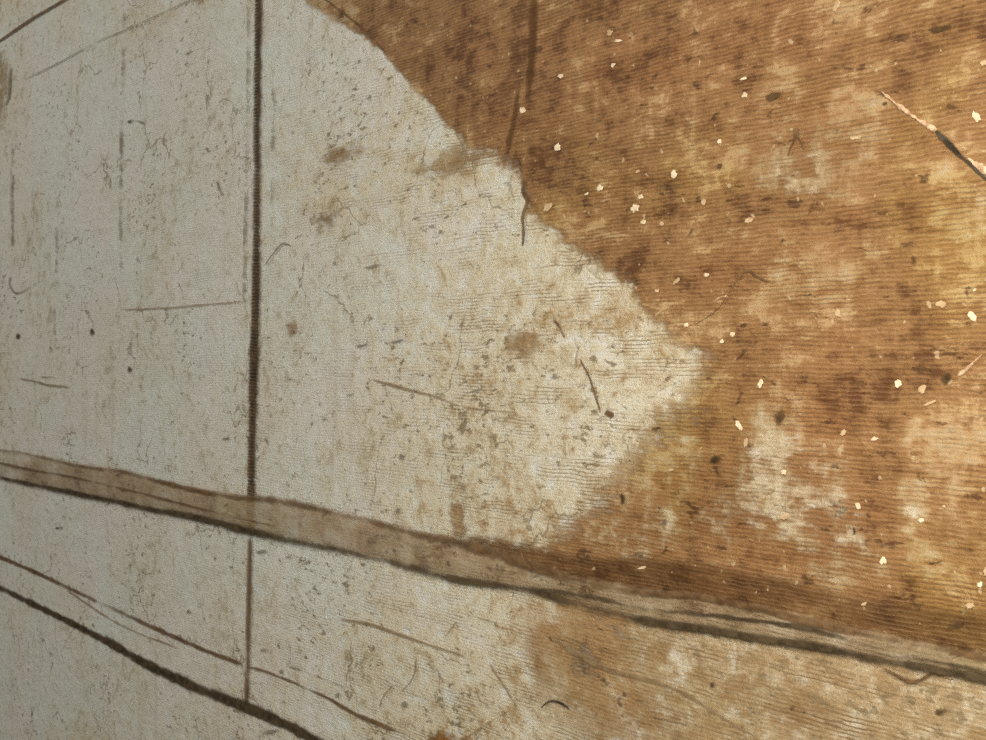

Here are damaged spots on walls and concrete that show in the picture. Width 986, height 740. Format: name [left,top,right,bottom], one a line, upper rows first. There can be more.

crack [881,91,986,180]
leakage [306,0,986,622]
crack [957,353,984,376]
leakage [530,596,700,740]